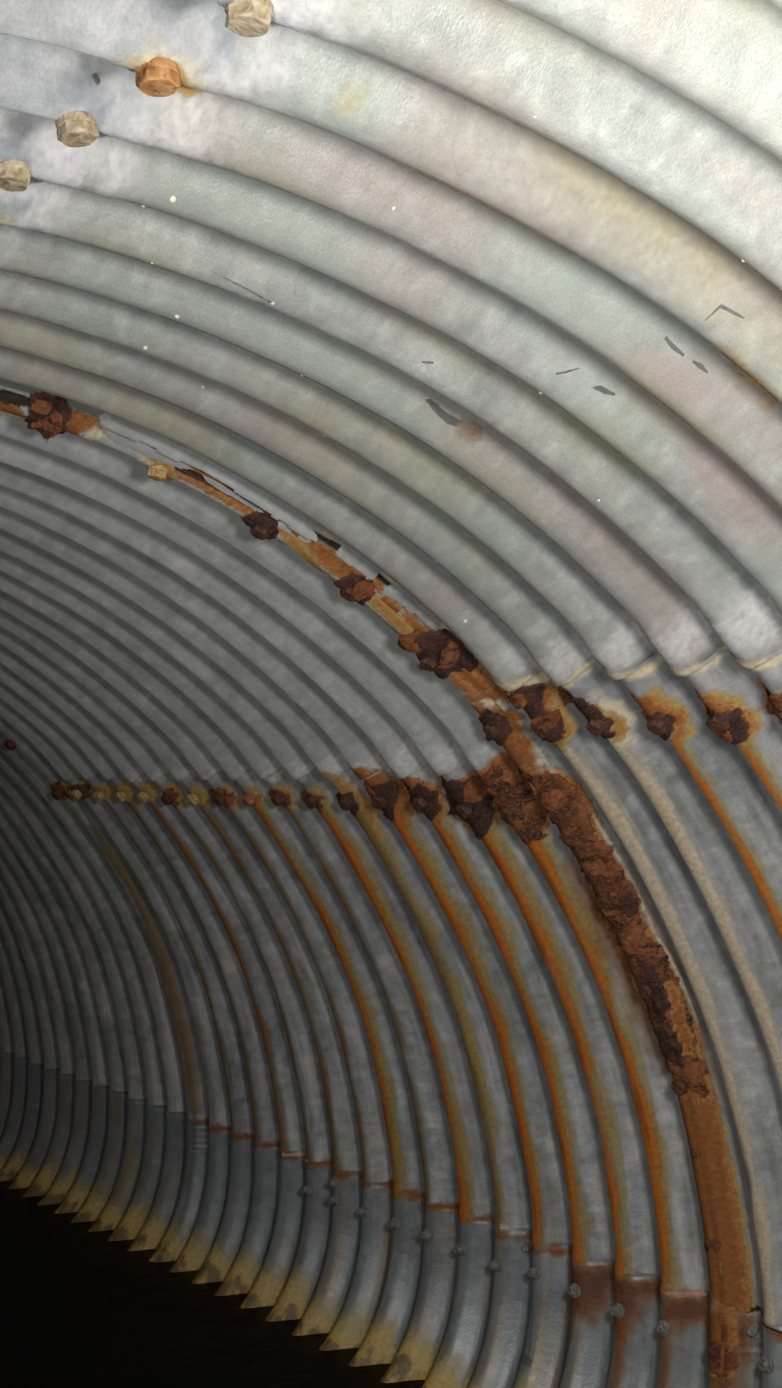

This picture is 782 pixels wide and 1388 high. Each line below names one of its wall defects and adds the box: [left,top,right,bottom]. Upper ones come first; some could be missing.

rust [118,51,206,96]
rust [0,389,107,441]
rust [50,446,782,1388]